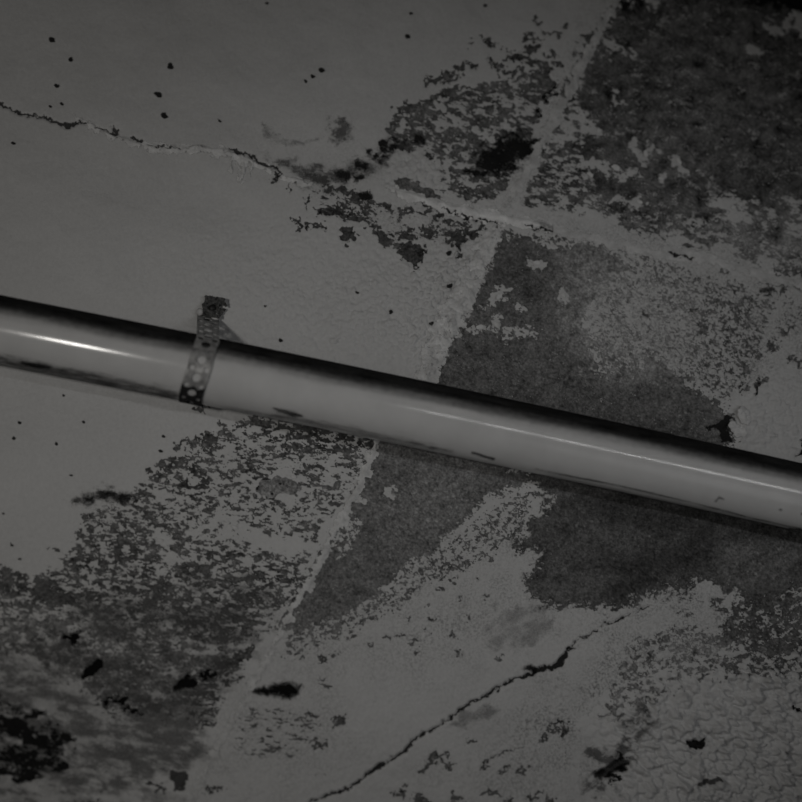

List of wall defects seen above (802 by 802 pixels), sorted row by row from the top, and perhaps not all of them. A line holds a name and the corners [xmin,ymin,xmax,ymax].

crack [0,102,181,150]
crack [229,148,283,180]
peeling [290,0,802,277]
peeling [437,228,802,446]
peeling [0,415,539,730]
peeling [598,582,802,722]
water stain [0,701,76,784]
peeling [235,707,346,759]
peeling [389,783,431,802]
peeling [418,750,457,774]
crack [310,606,649,802]
peeling [539,717,570,743]